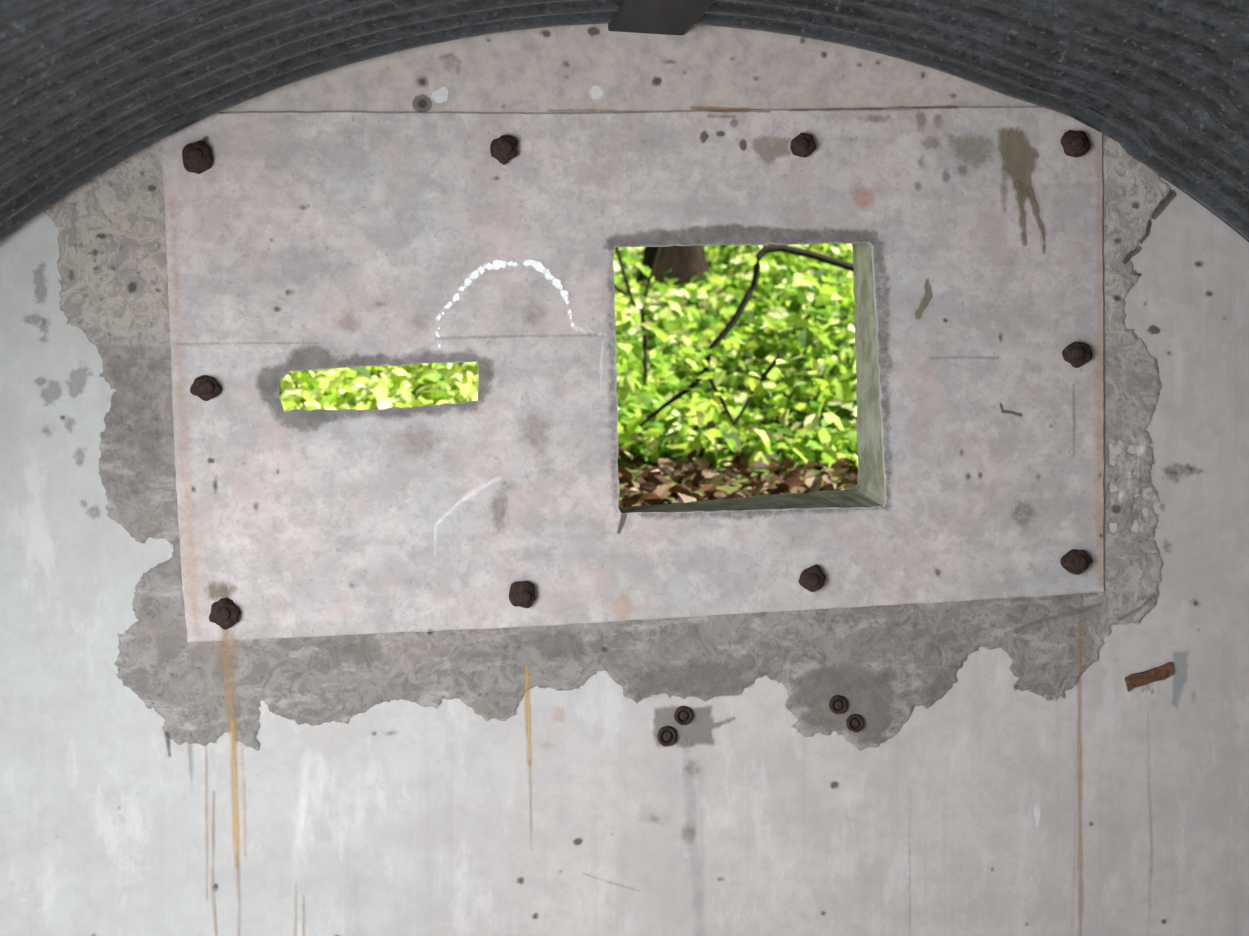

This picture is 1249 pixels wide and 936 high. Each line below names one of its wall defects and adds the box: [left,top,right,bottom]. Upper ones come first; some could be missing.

peeling [34,134,1192,750]
water stain [957,129,1045,250]